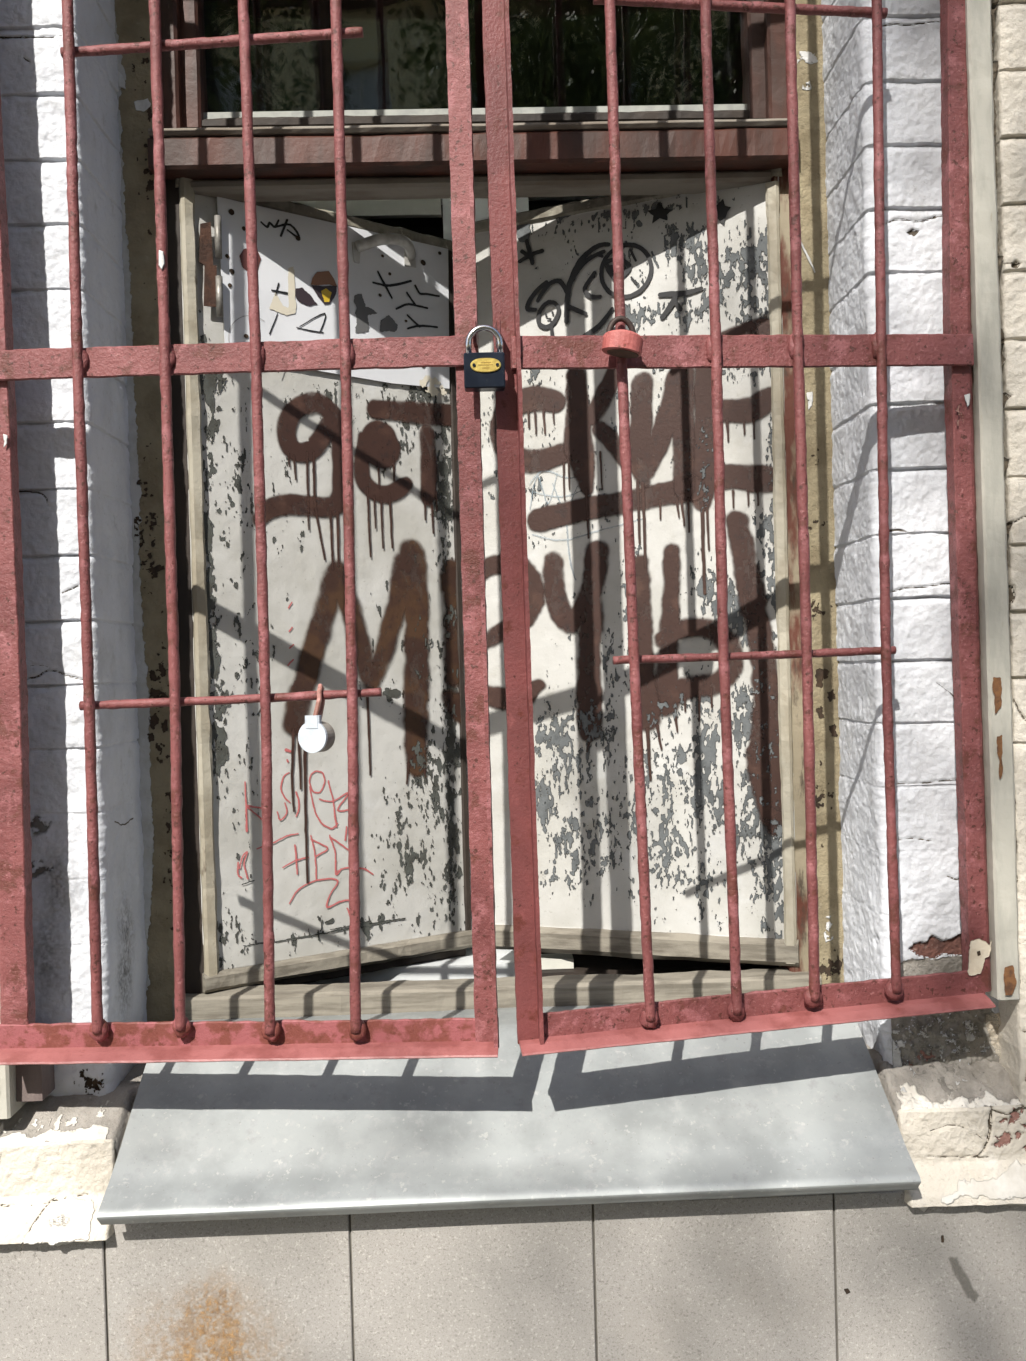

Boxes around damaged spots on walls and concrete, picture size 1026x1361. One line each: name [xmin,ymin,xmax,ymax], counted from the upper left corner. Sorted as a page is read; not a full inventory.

flaking render [901,934,992,977]
peeling [1004,965,1017,996]
spalling [891,1008,1001,1104]
peeling [74,1069,113,1118]
peeling [0,1114,78,1133]
spalling [975,1106,1026,1158]
rust [165,1299,251,1361]